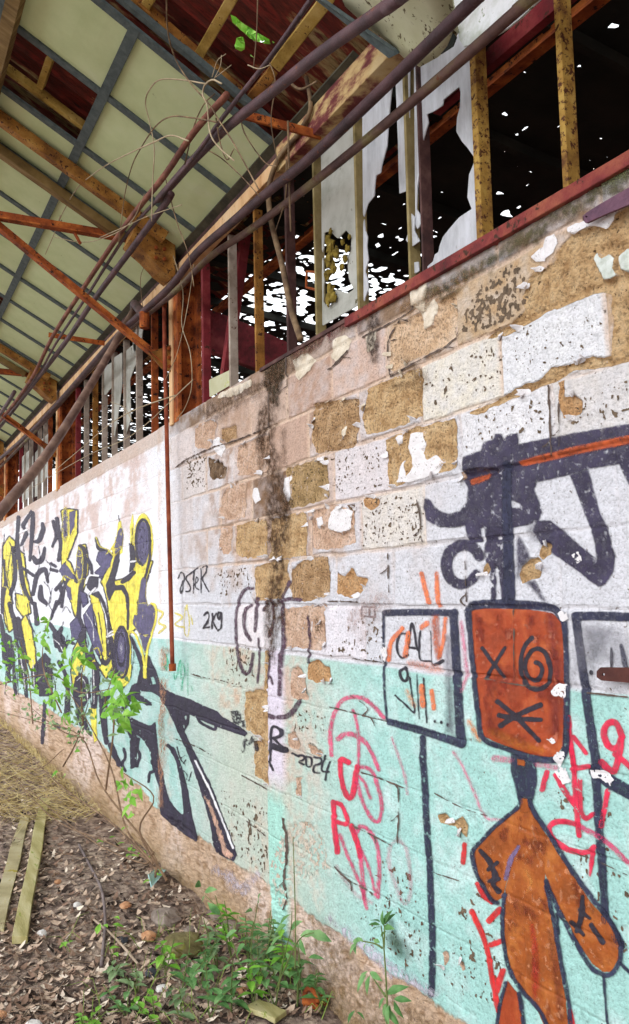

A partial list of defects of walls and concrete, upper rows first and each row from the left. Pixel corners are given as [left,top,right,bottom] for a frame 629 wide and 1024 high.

damp [256,361,292,659]
peeling [185,207,629,757]
corrosion [158,680,166,807]
peeling [226,645,269,787]